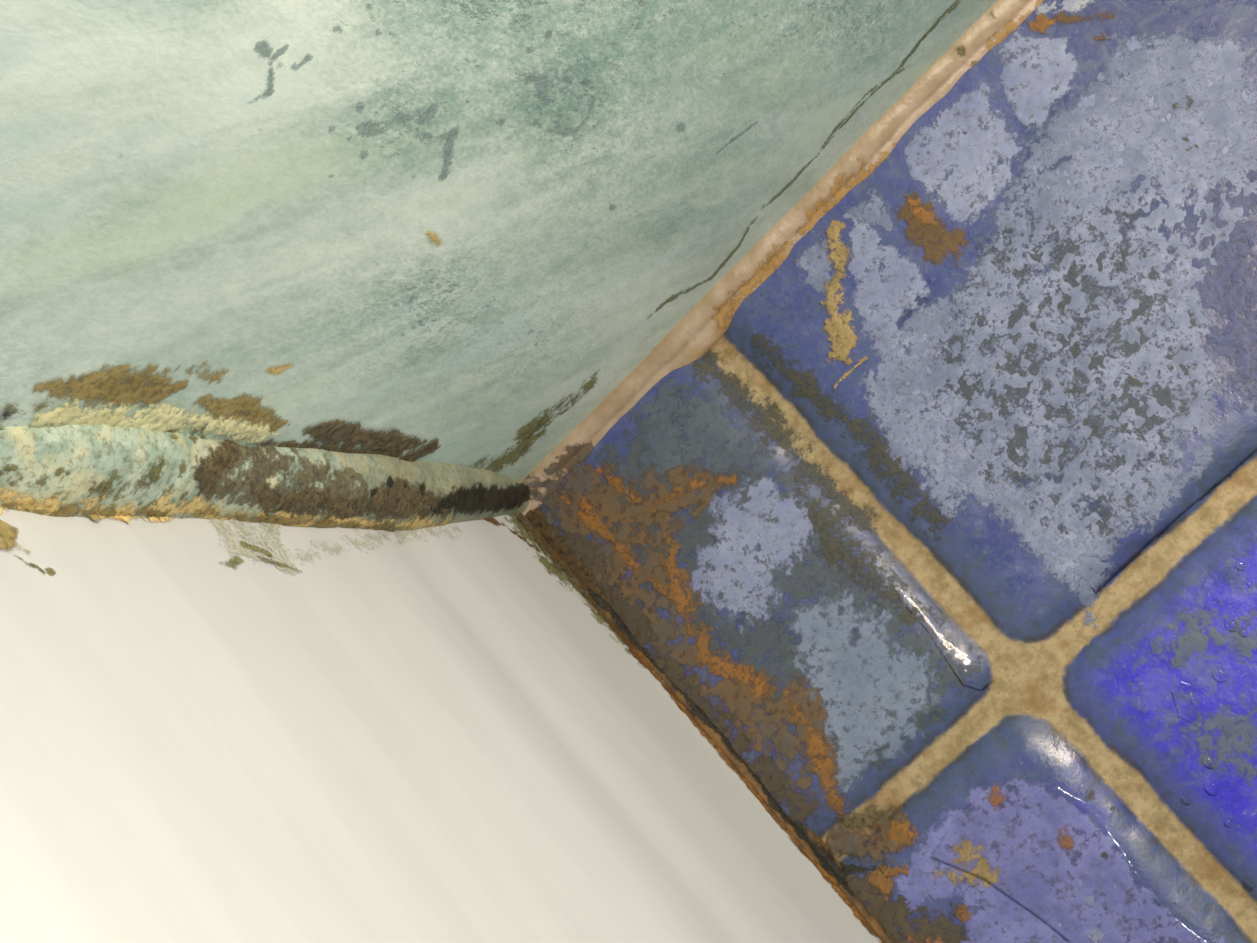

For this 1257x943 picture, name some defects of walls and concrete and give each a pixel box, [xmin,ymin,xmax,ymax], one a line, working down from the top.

corrosion [986,0,1114,50]
crack [649,0,962,318]
corrosion [897,192,971,266]
corrosion [711,143,896,389]
peeling [0,519,56,576]
peeling [221,541,303,572]
corrosion [526,442,972,943]
corrosion [988,783,1005,806]
corrosion [933,840,1004,888]
corrosion [1058,827,1074,850]